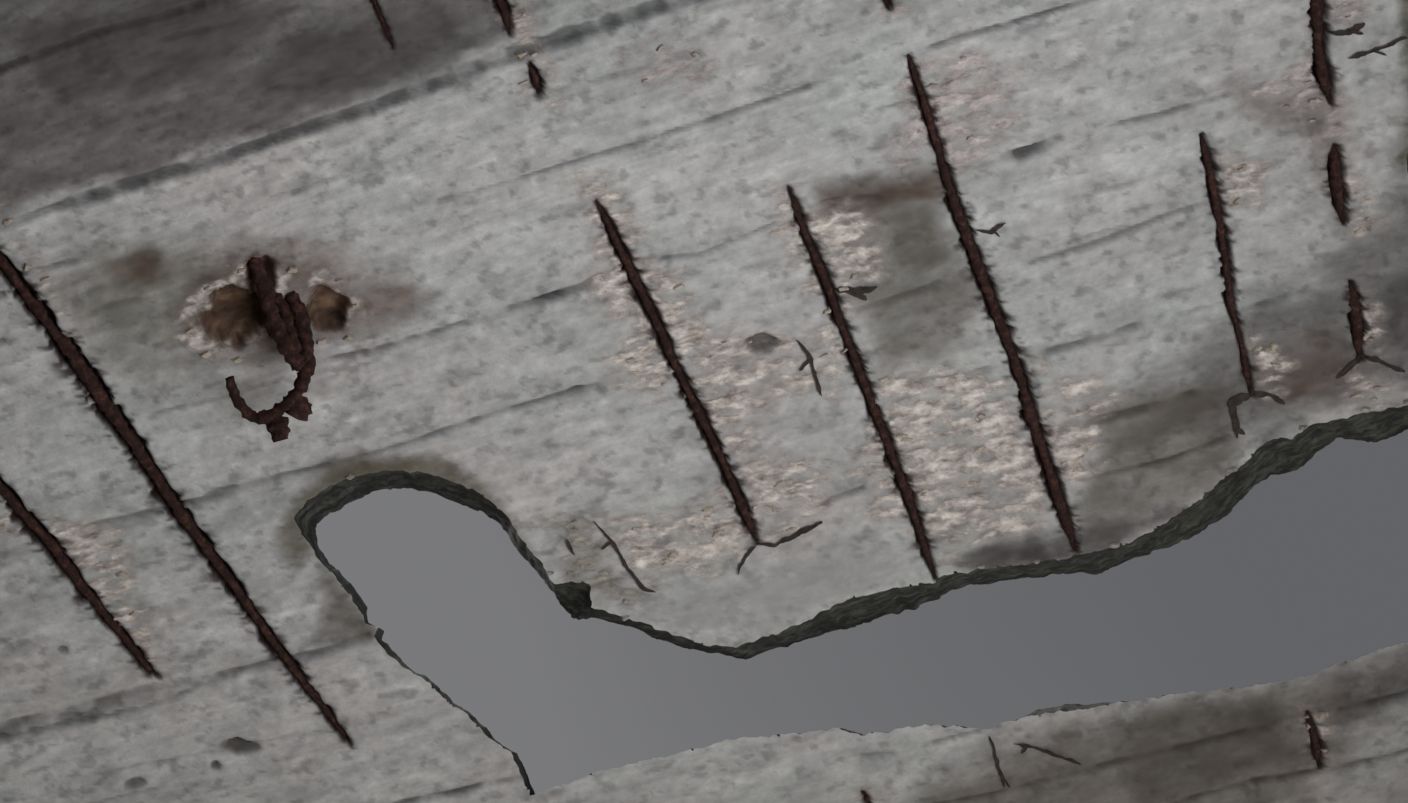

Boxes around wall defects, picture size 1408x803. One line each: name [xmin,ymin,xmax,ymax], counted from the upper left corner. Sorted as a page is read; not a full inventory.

crack [976,223,1005,237]
crack [832,286,877,301]
crack [1336,355,1405,379]
spalling [294,51,1408,795]